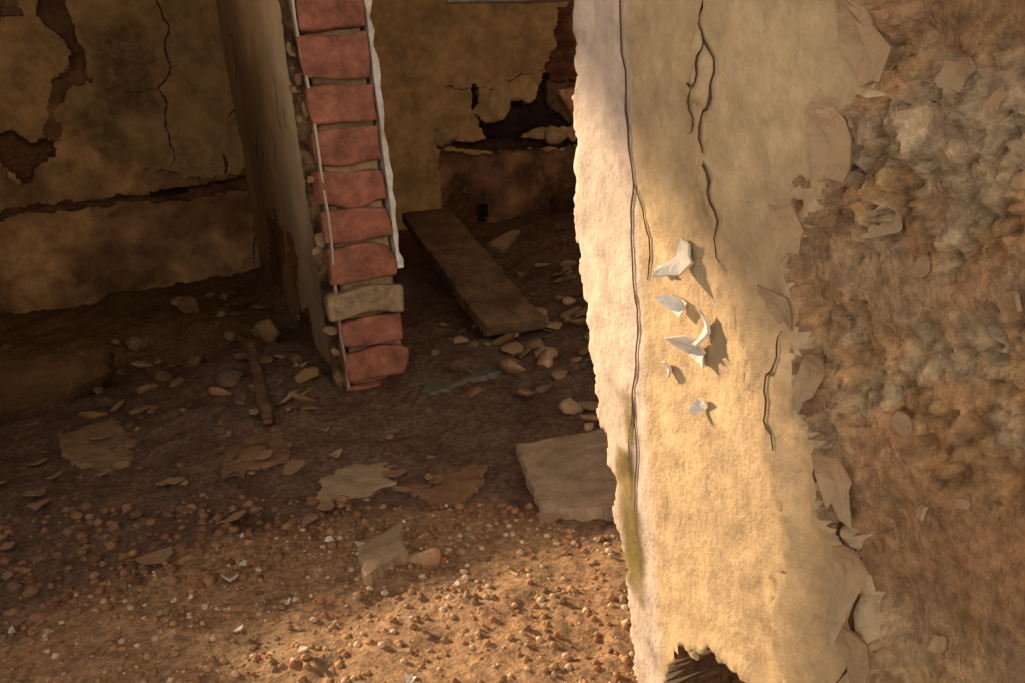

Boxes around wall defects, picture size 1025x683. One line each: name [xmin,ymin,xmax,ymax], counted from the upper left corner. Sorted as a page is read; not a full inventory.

spalling [470,2,578,139]
crack [0,0,287,268]
peeling [361,0,404,268]
spalling [438,146,577,223]
peeling [652,237,694,277]
peeling [654,295,711,369]
spalling [756,0,1025,683]
peeling [688,398,709,416]
spalling [666,646,746,683]